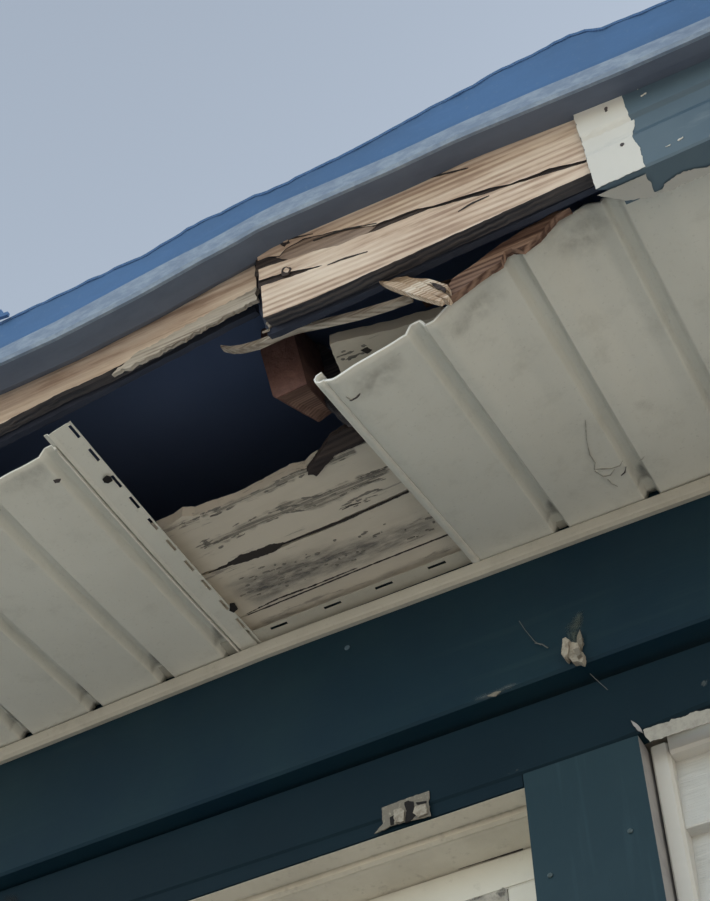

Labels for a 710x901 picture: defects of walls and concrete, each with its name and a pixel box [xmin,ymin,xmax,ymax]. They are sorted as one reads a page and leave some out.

peeling [573,96,710,201]
crack [255,161,587,292]
peeling [179,466,388,549]
peeling [374,791,431,834]